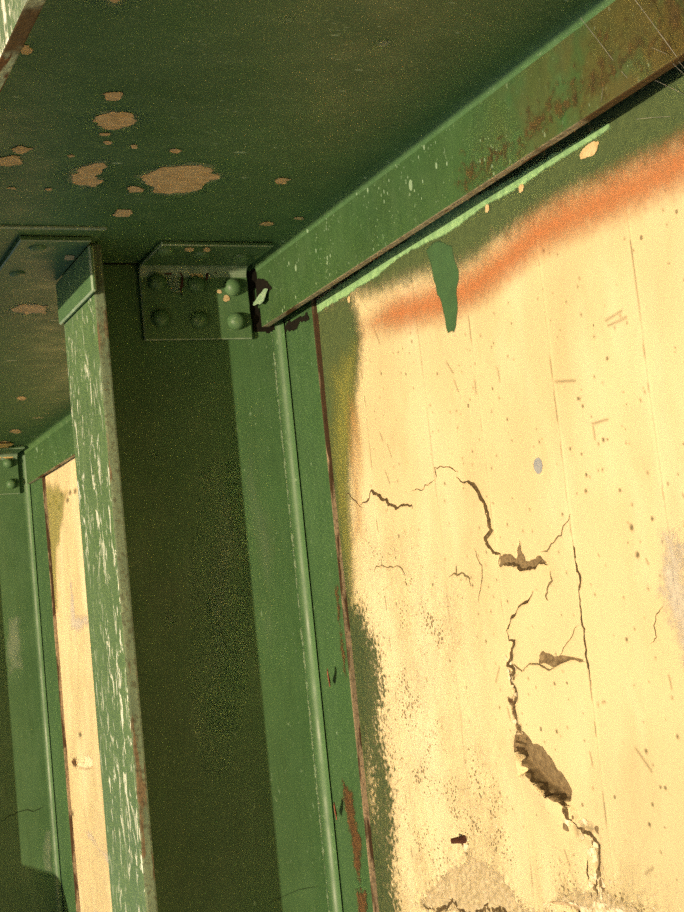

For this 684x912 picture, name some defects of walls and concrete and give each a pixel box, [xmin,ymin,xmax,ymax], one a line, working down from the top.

peeling [93,92,137,145]
peeling [0,146,33,166]
peeling [68,161,107,187]
peeling [127,162,221,195]
peeling [113,209,133,217]
peeling [11,303,48,314]
peeling [253,288,268,306]
crack [343,466,500,602]
crack [542,519,591,683]
crack [504,575,552,739]
spalling [423,857,523,912]
spalling [546,815,637,912]